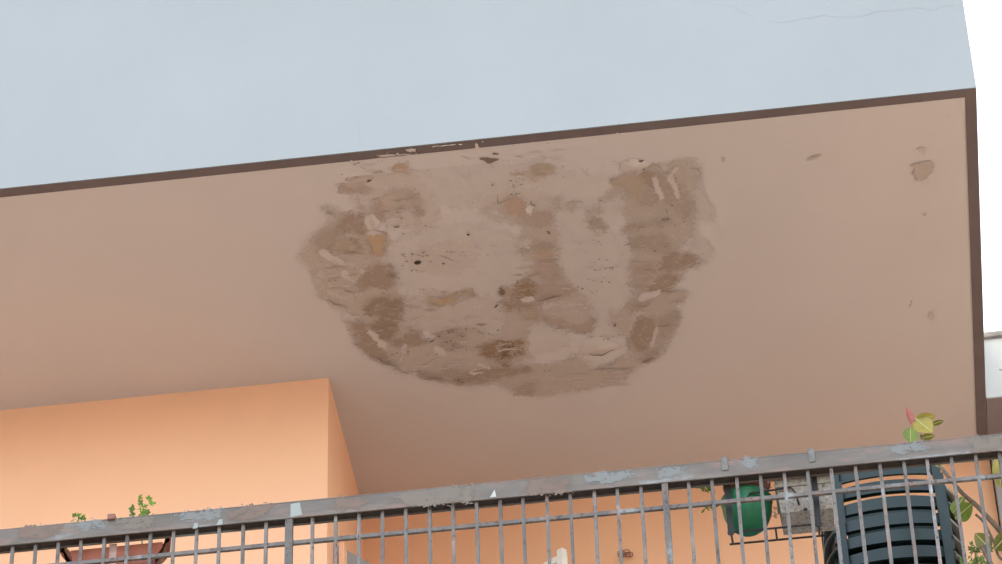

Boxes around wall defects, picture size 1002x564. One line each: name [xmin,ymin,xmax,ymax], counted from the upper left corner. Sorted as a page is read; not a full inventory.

flaking render [406,234,482,277]